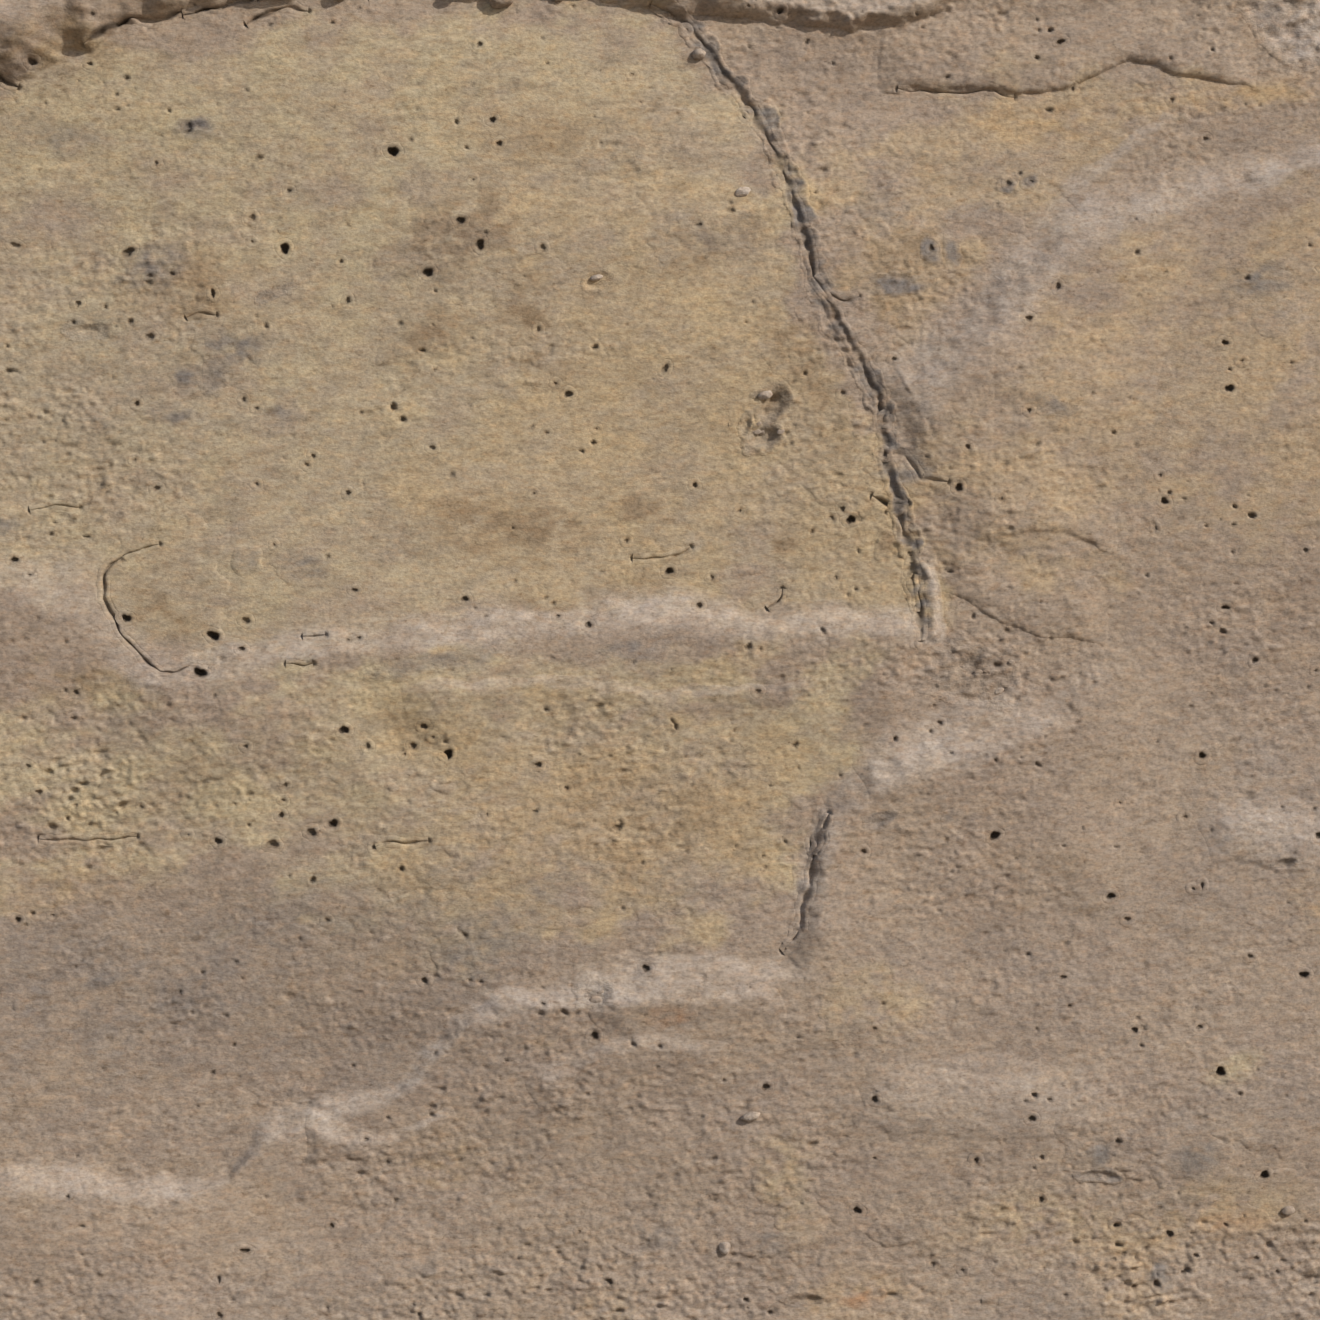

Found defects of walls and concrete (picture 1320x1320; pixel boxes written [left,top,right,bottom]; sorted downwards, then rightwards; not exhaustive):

crack [897,82,1014,103]
crack [649,0,949,651]
crack [97,540,192,678]